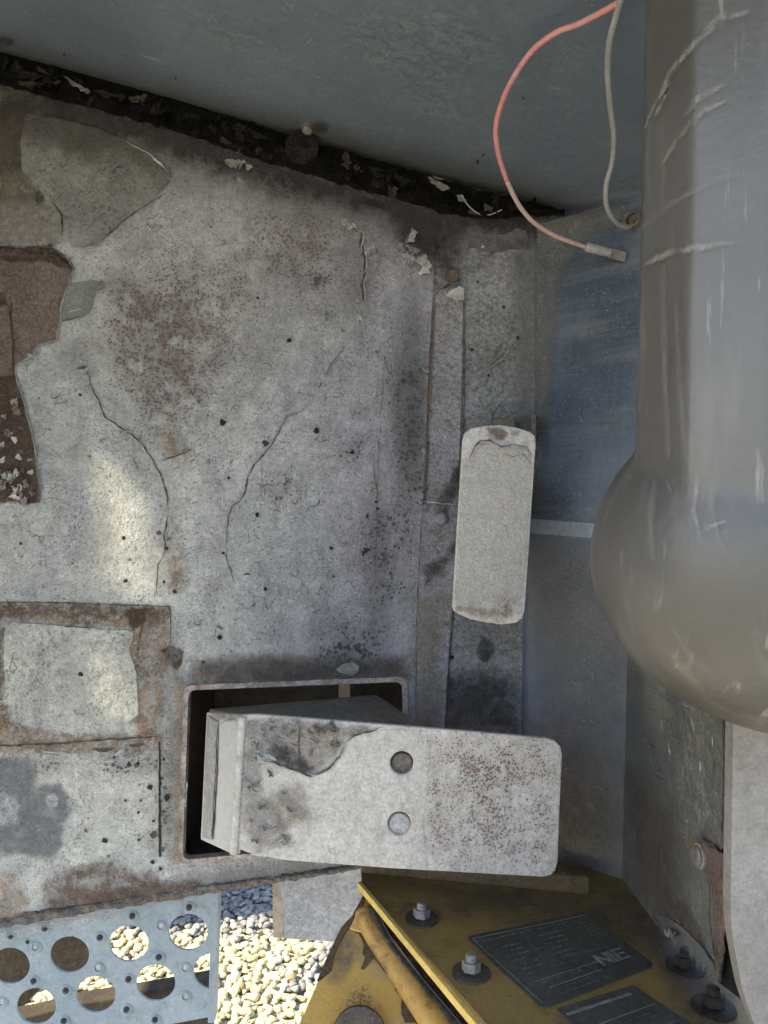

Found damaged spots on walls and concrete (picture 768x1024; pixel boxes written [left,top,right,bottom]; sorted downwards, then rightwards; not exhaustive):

peeling [20,114,171,249]
crack [0,366,171,673]
crack [225,346,344,581]
rust [0,603,170,754]
rust [696,837,725,978]